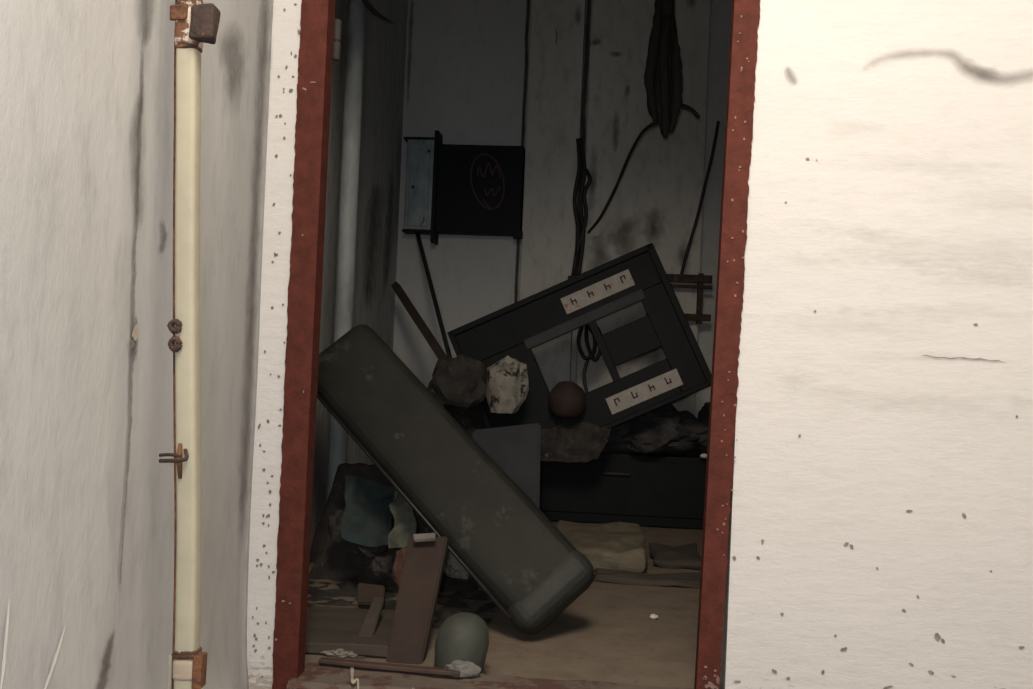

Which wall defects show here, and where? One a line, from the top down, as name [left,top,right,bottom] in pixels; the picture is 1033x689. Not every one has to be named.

spalling [702,666,720,689]